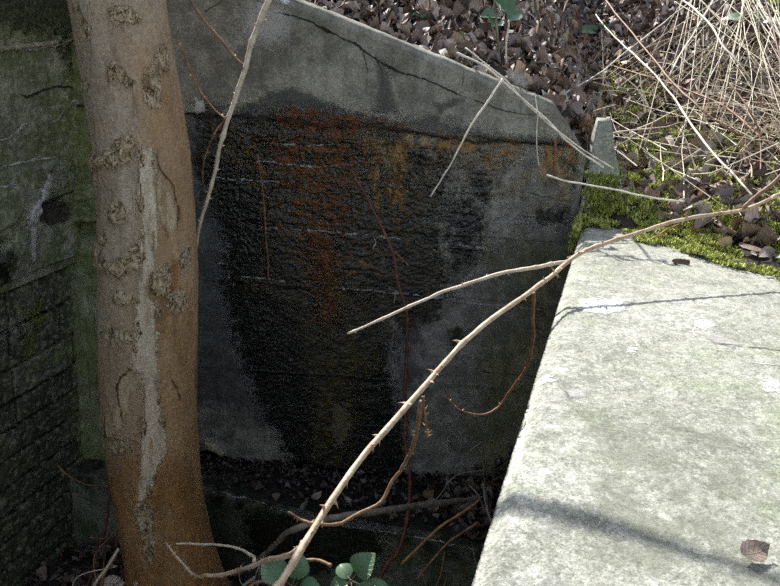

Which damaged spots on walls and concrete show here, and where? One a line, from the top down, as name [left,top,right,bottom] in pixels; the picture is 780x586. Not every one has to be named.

crack [257,0,555,115]
leakage [191,59,574,477]
corrosion [273,109,587,332]